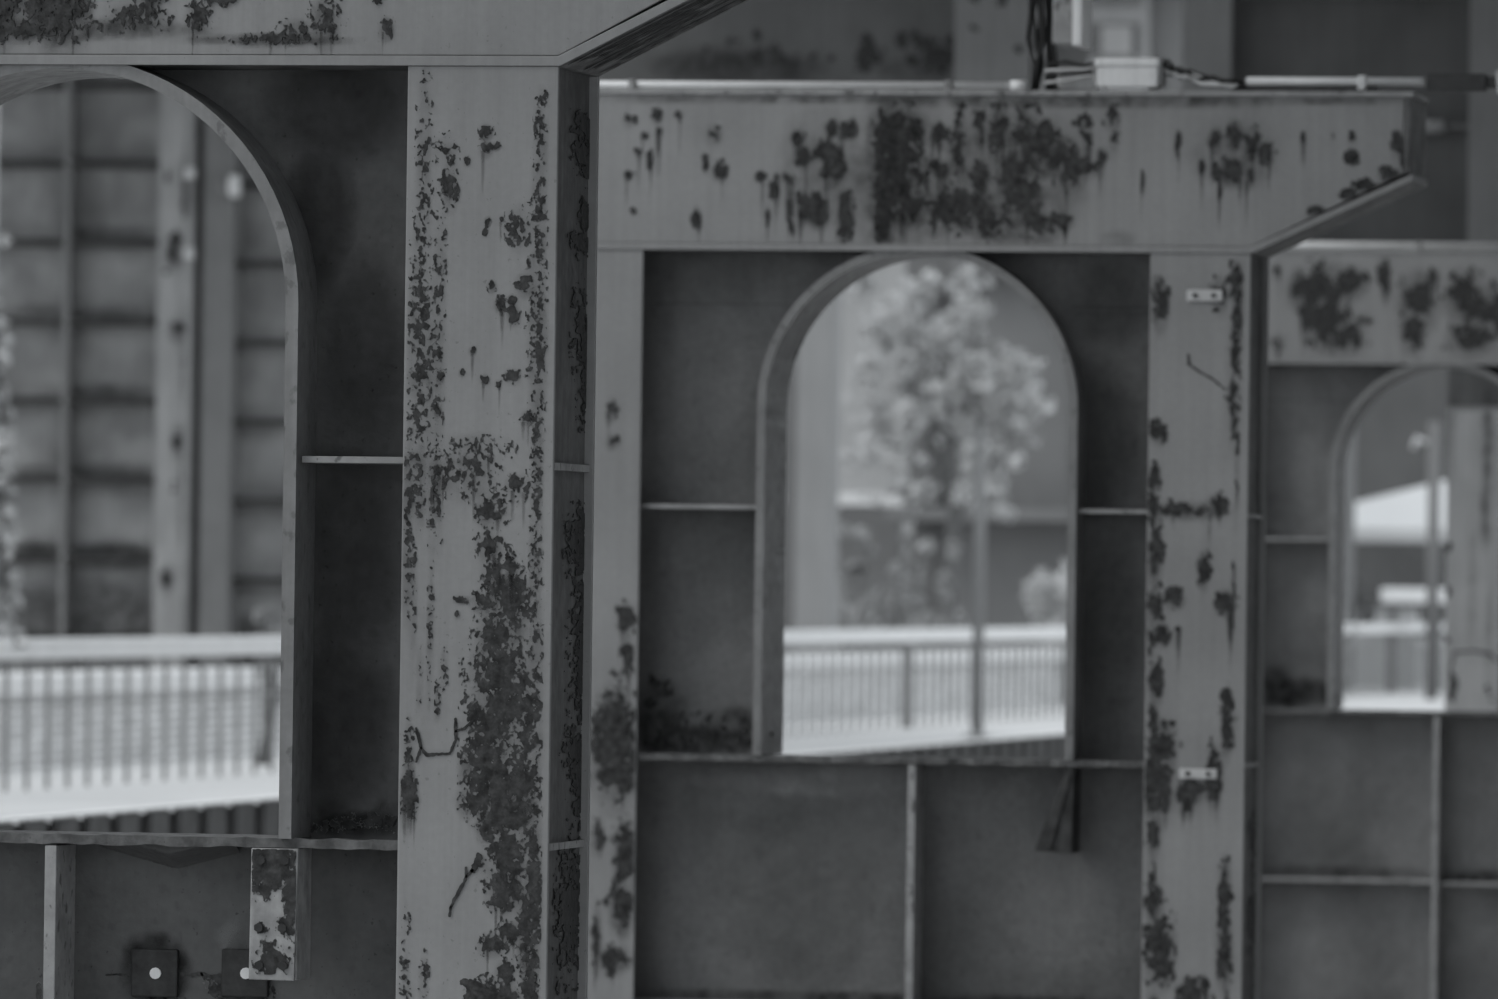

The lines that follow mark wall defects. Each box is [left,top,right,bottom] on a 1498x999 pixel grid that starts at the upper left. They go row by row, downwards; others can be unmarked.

rust [624,107,681,180]
rust [690,206,701,229]
rust [701,124,728,180]
rust [755,98,1121,244]
rust [1197,122,1278,198]
rust [1306,130,1403,215]
rust [1273,259,1498,351]
rust [403,70,549,715]
rust [1142,259,1244,999]
rust [400,717,419,820]
rust [202,849,296,999]
rust [399,912,430,999]